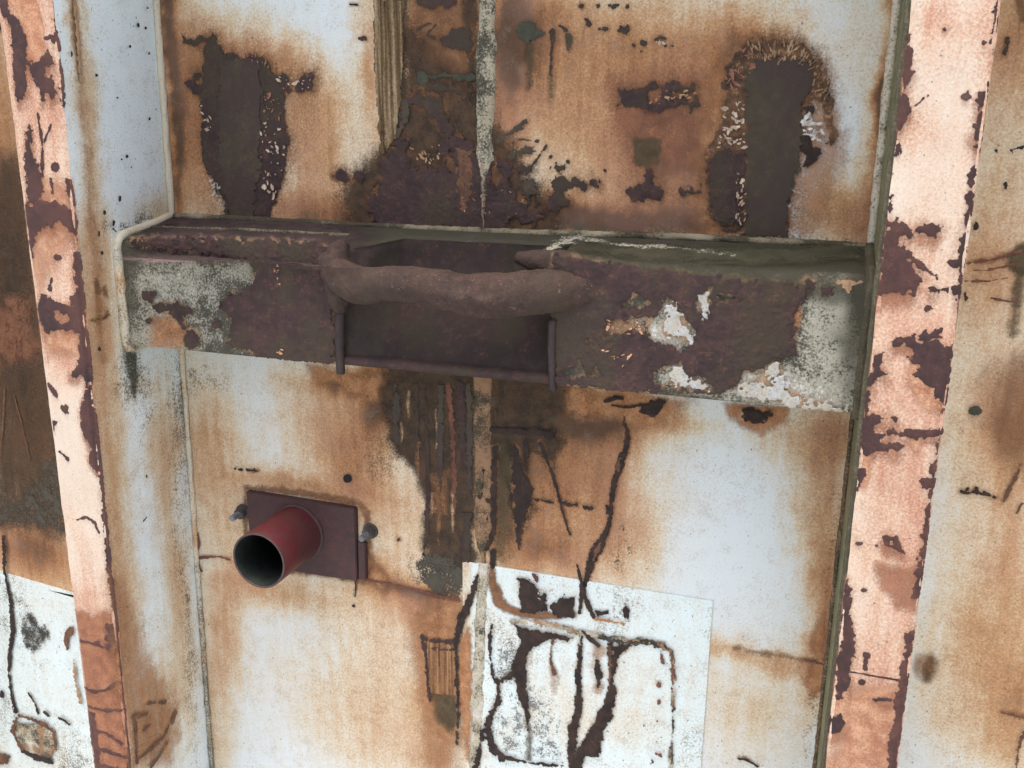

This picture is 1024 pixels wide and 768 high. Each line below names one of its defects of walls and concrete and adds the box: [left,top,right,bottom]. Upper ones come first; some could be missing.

peeling [700,37,838,237]
rust [128,0,607,571]
peeling [657,301,696,345]
peeling [697,289,711,321]
peeling [803,278,863,297]
peeling [669,364,710,393]
peeling [737,362,849,412]
rust [488,252,808,620]